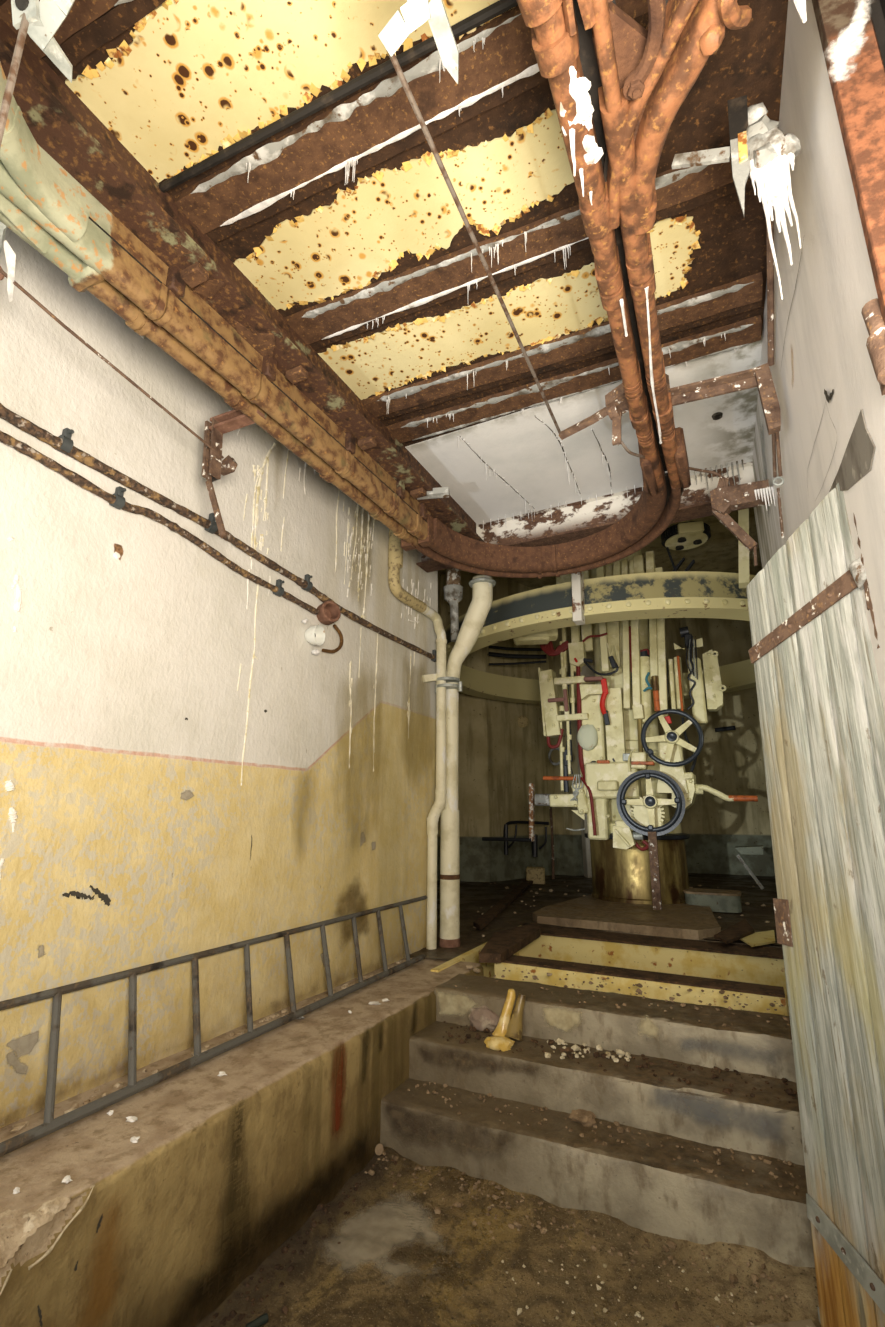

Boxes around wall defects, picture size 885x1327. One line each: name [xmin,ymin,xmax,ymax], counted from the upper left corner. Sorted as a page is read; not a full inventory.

leakage [237,443,316,786]
leakage [335,489,378,771]
rust [332,1043,345,1135]
spalling [0,1185,95,1295]
leakage [173,1112,366,1327]
leakage [326,1196,440,1276]